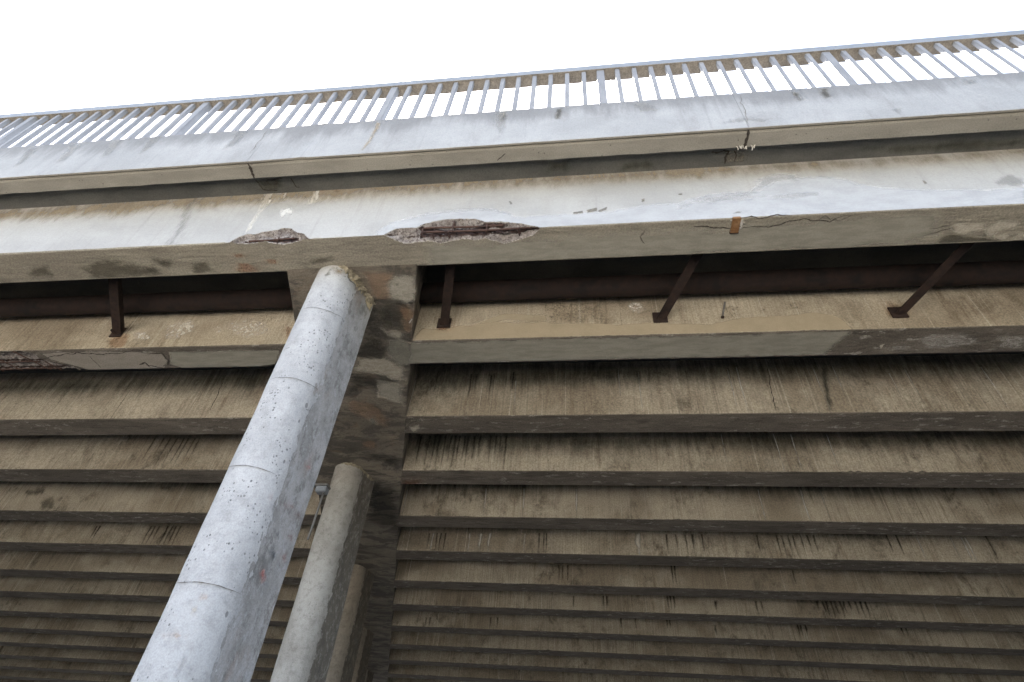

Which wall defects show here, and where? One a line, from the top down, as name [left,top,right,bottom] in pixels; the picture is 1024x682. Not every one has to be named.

crack [741,98,750,147]
spalling [229,228,309,245]
spalling [384,218,540,244]
crack [693,214,853,229]
water stain [413,356,1015,405]
water stain [407,436,602,455]
water stain [370,484,535,525]
water stain [791,486,918,513]